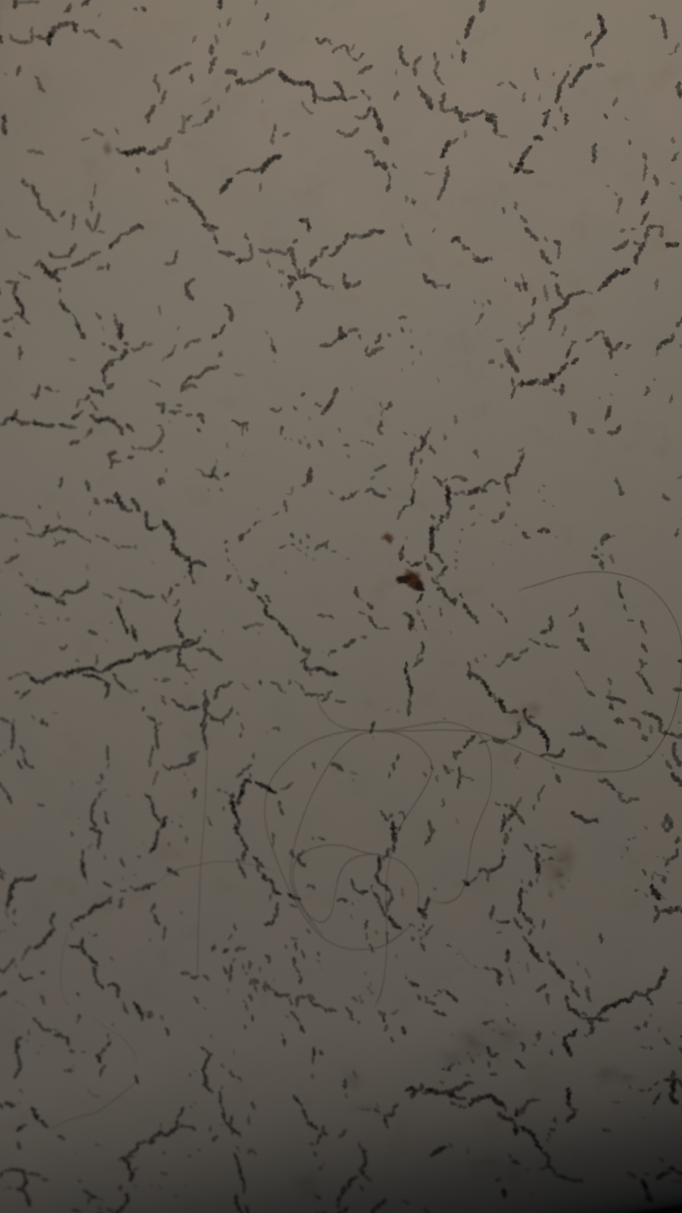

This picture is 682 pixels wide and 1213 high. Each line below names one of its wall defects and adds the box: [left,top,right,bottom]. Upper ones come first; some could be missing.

crack [0,177,144,339]
crack [81,37,391,312]
crack [398,0,664,399]
crack [0,745,160,1079]
crack [0,313,233,853]
crack [228,763,306,927]
crack [242,578,425,717]
corrosion [396,570,425,591]
crack [339,427,525,624]
crack [452,615,608,789]
crack [461,797,669,1057]
crack [570,580,682,923]